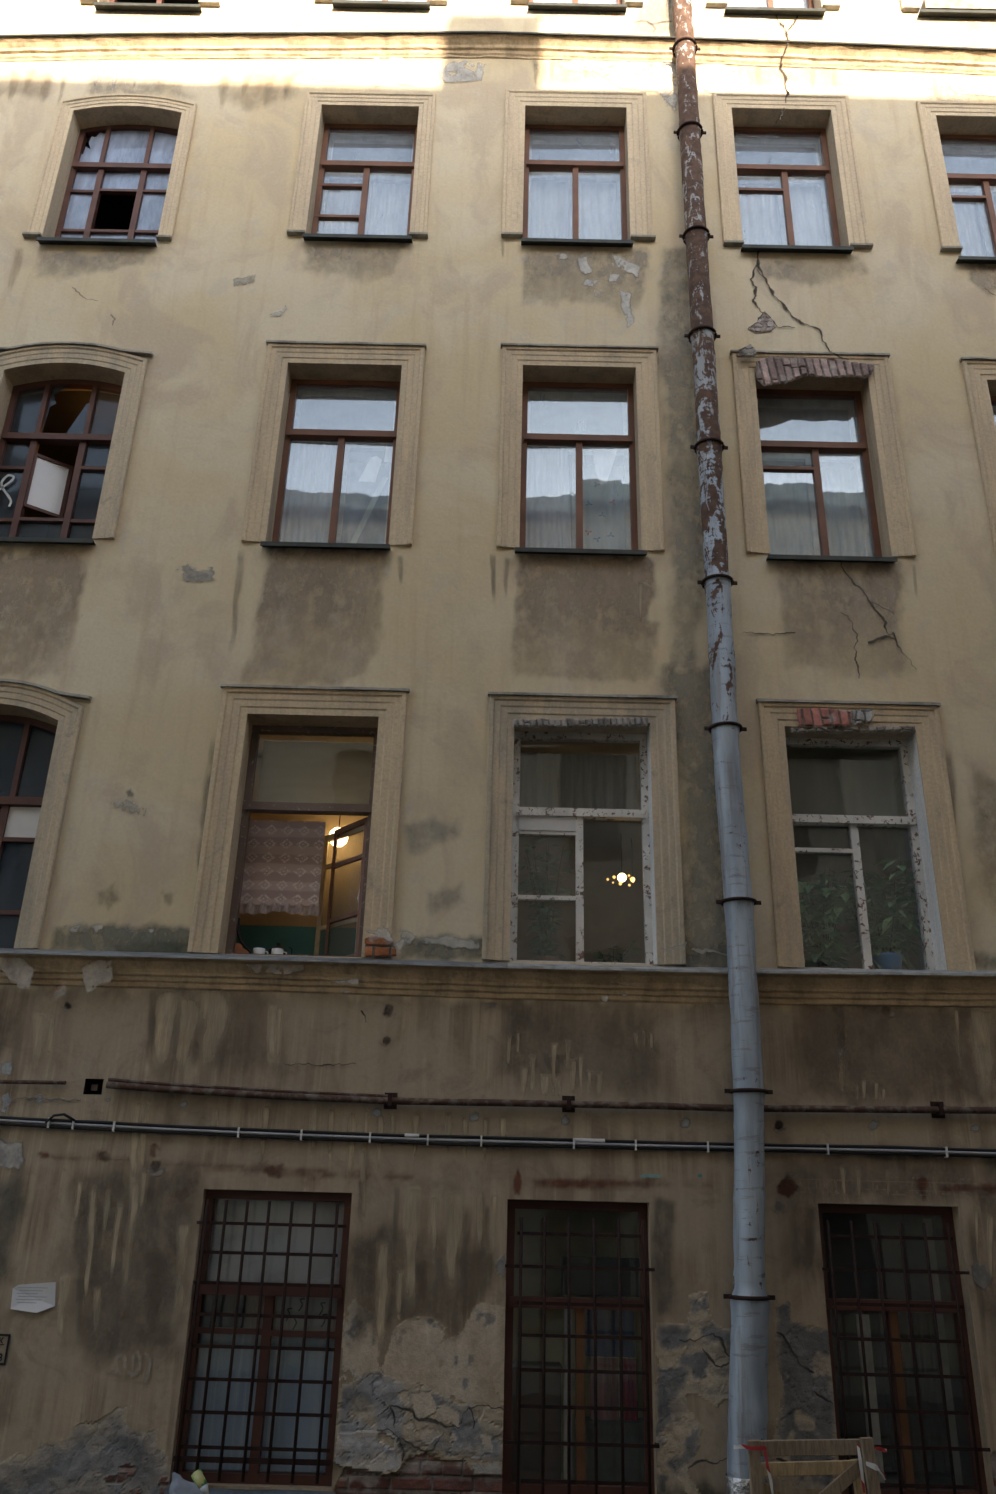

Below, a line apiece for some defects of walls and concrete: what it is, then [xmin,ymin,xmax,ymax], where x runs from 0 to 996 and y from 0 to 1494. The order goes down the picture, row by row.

crack [775,15,798,122]
crack [750,251,849,360]
flaking render [738,312,875,386]
water stain [518,557,653,639]
water stain [656,250,728,968]
crack [840,562,914,679]
water stain [149,989,282,1065]
water stain [58,1104,197,1355]
spalling [0,1405,171,1494]
peeling [333,1299,505,1494]
spalling [654,1293,731,1494]
spalling [771,1301,837,1489]